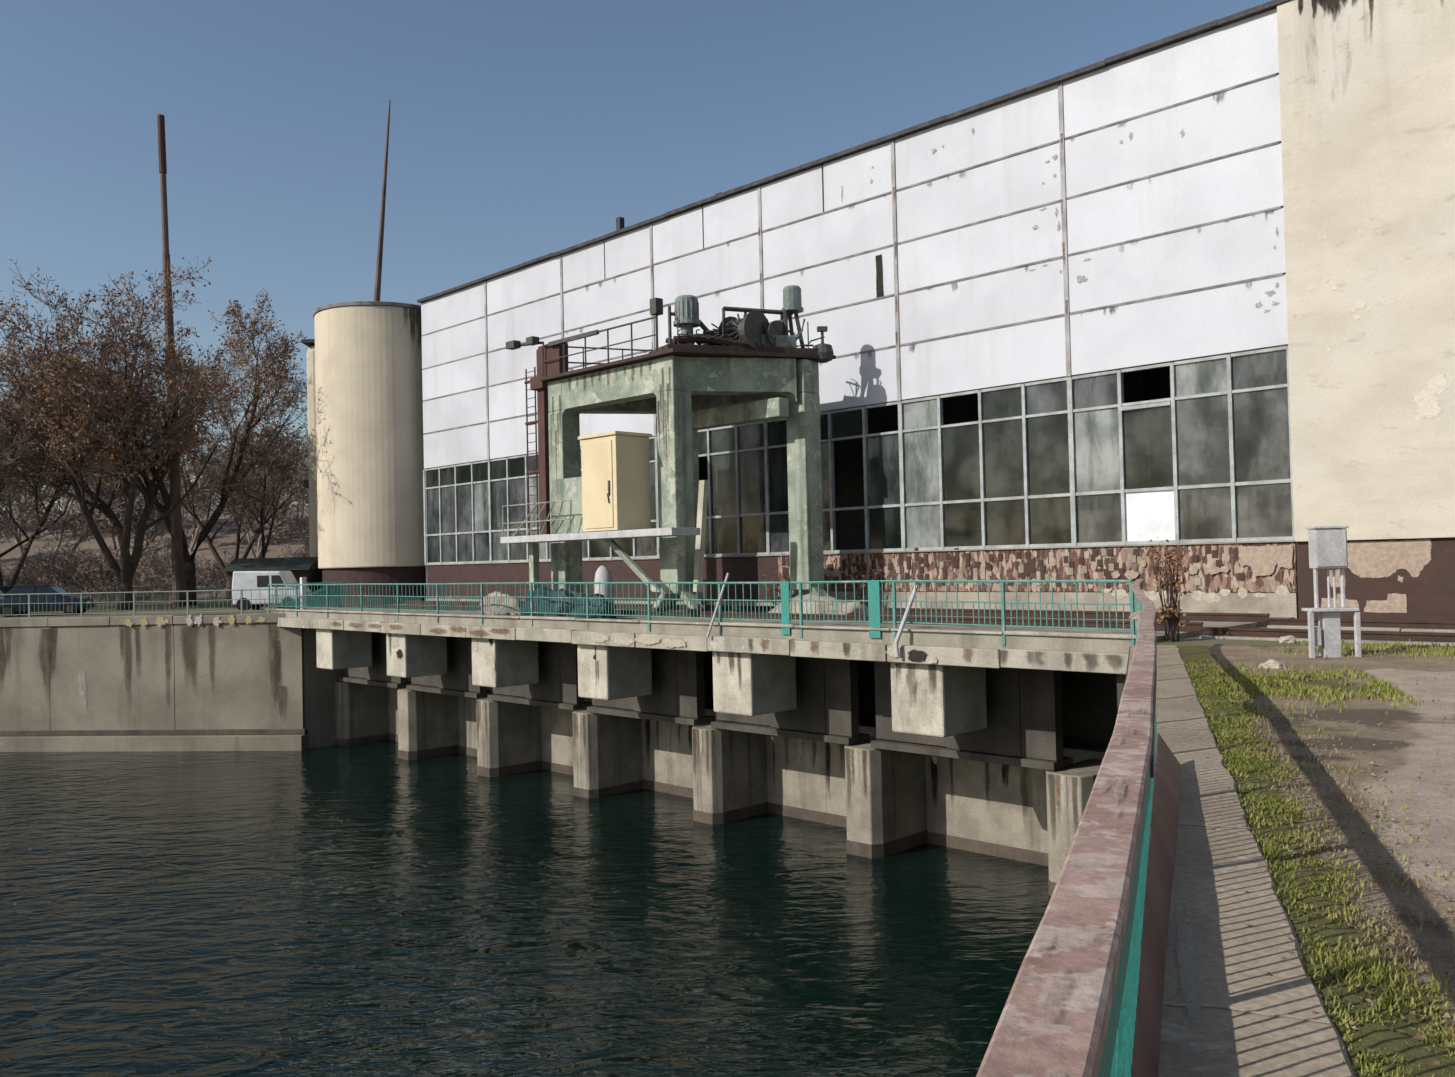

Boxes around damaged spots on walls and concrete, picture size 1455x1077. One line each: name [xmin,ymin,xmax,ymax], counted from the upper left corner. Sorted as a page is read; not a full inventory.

damp [1298,0,1373,18]
spalling [1321,539,1432,613]
damp [41,627,57,679]
damp [120,625,140,680]
damp [165,624,214,678]
damp [268,623,284,708]
damp [895,663,936,720]
damp [1064,652,1120,666]
damp [645,719,708,767]
damp [772,735,875,789]
damp [931,755,1027,812]